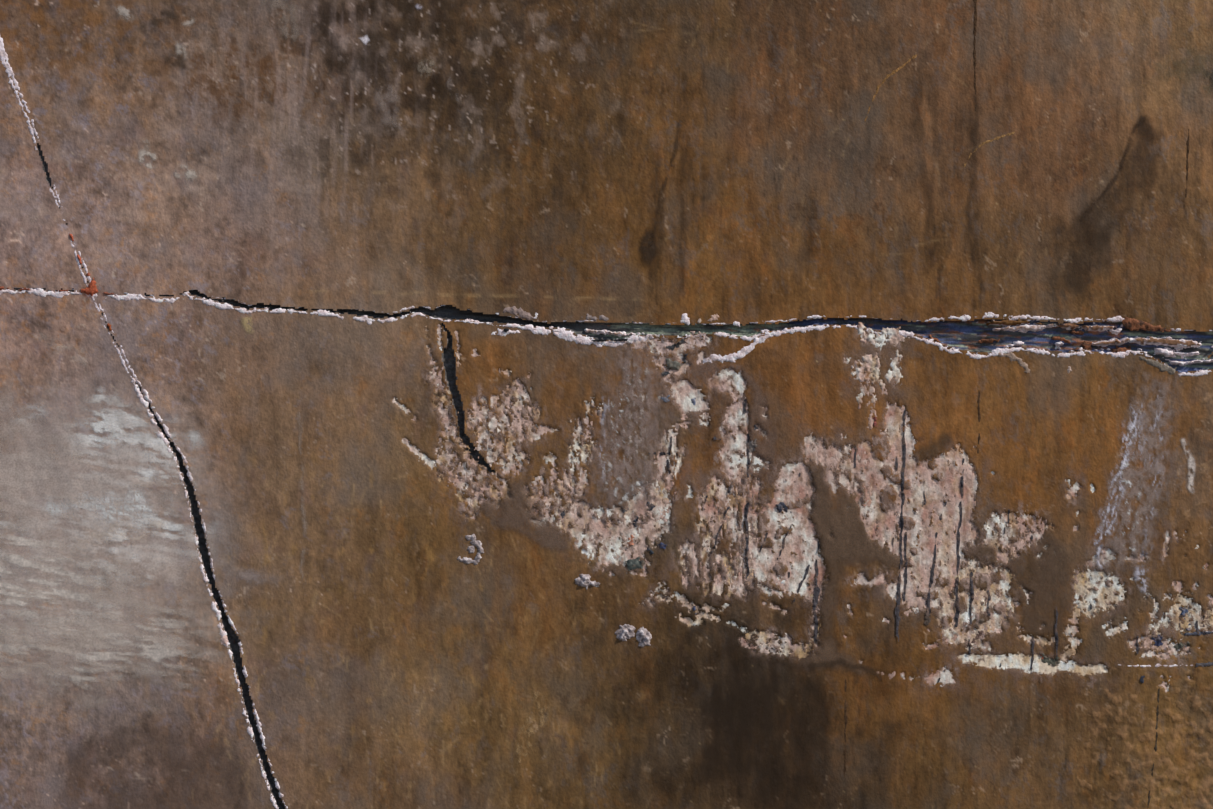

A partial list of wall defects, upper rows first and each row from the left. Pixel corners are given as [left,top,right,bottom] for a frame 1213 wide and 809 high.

crack [865,55,917,121]
crack [971,0,979,111]
crack [0,37,68,225]
crack [1183,129,1191,197]
corrosion [57,255,114,296]
corrosion [1052,330,1092,351]
peeling [392,397,417,421]
crack [0,241,1213,809]
peeling [402,322,1213,687]